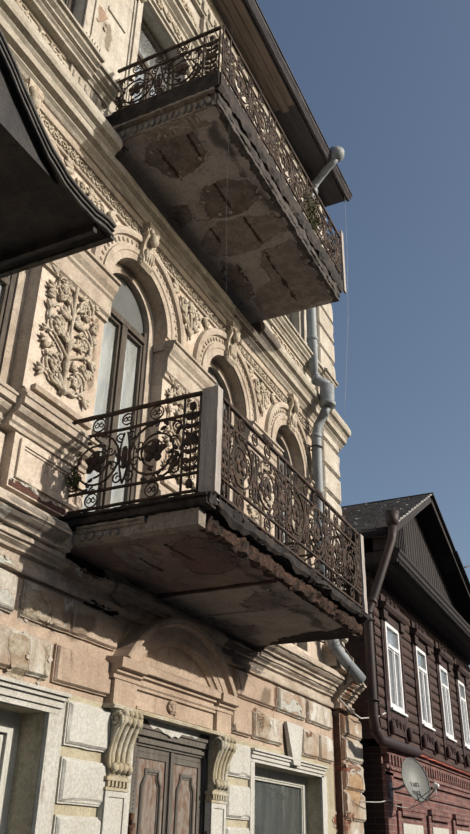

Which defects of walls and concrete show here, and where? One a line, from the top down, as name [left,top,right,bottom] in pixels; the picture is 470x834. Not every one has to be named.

flaking render [139,125,213,181]
flaking render [167,175,333,319]
peeling [0,502,15,524]
flaking render [0,476,67,516]
flaking render [332,756,364,834]